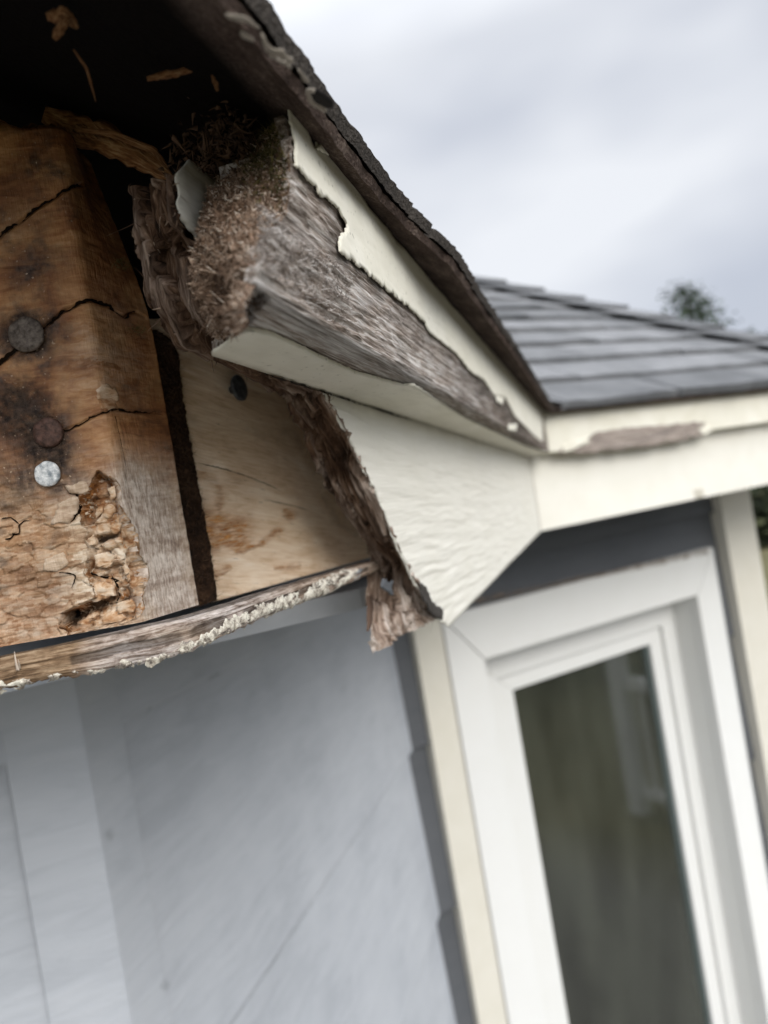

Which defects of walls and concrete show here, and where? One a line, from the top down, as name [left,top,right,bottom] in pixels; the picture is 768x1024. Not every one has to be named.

crack [0,184,88,237]
peeling [244,115,713,455]
crack [43,298,145,329]
crack [0,349,18,365]
leakage [0,383,64,468]
peeling [50,481,89,525]
peeling [88,486,130,575]
peeling [43,552,68,572]
peeling [47,568,364,683]
peeling [366,578,394,632]
peeling [419,583,443,620]
peeling [0,678,34,695]